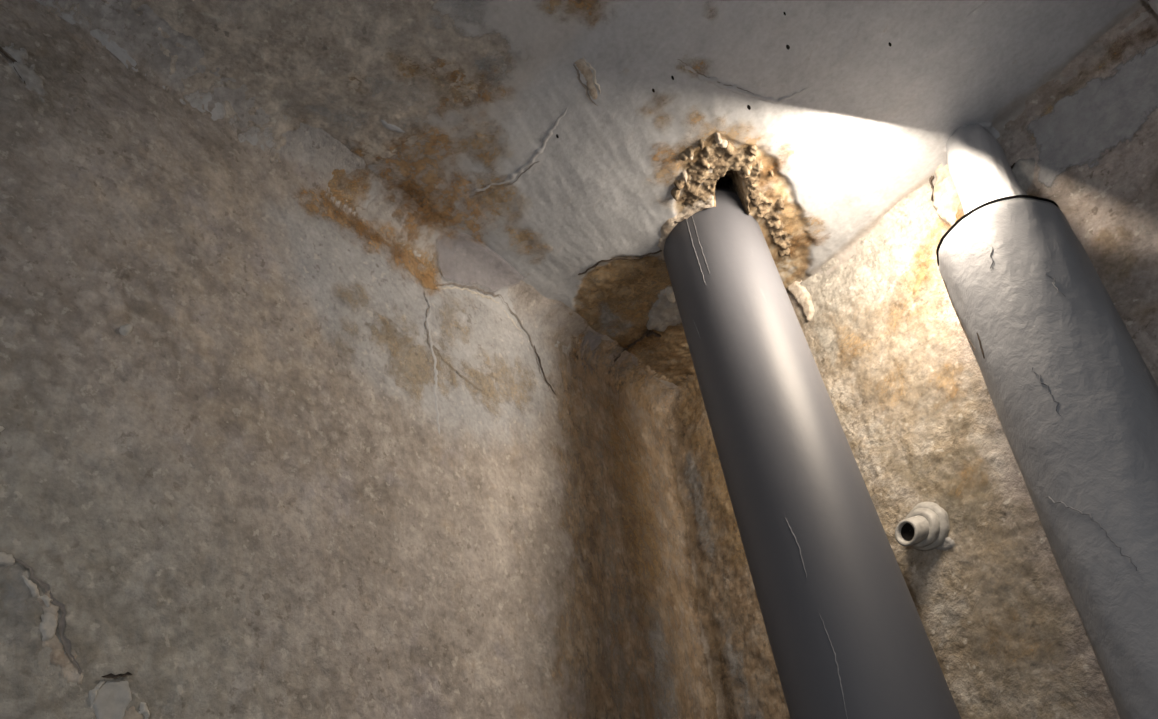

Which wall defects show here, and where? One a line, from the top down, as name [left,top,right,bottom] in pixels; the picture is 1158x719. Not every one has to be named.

spalling [657,132,791,264]
crack [424,282,555,434]
damp [532,340,790,719]
peeling [0,552,150,719]